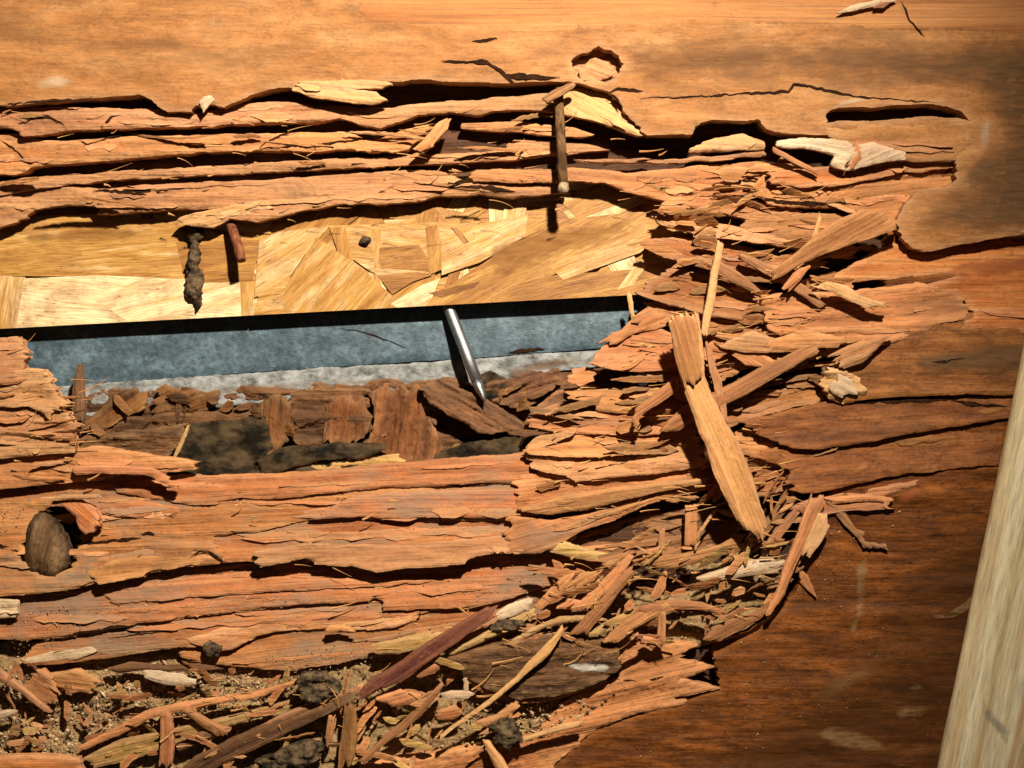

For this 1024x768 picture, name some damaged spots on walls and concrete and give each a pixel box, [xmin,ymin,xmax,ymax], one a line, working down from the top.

crack [902,3,923,35]
crack [442,38,560,83]
peeling [564,50,644,138]
crack [607,83,938,105]
peeling [0,79,565,230]
peeling [0,123,1024,671]
crack [852,395,1006,407]